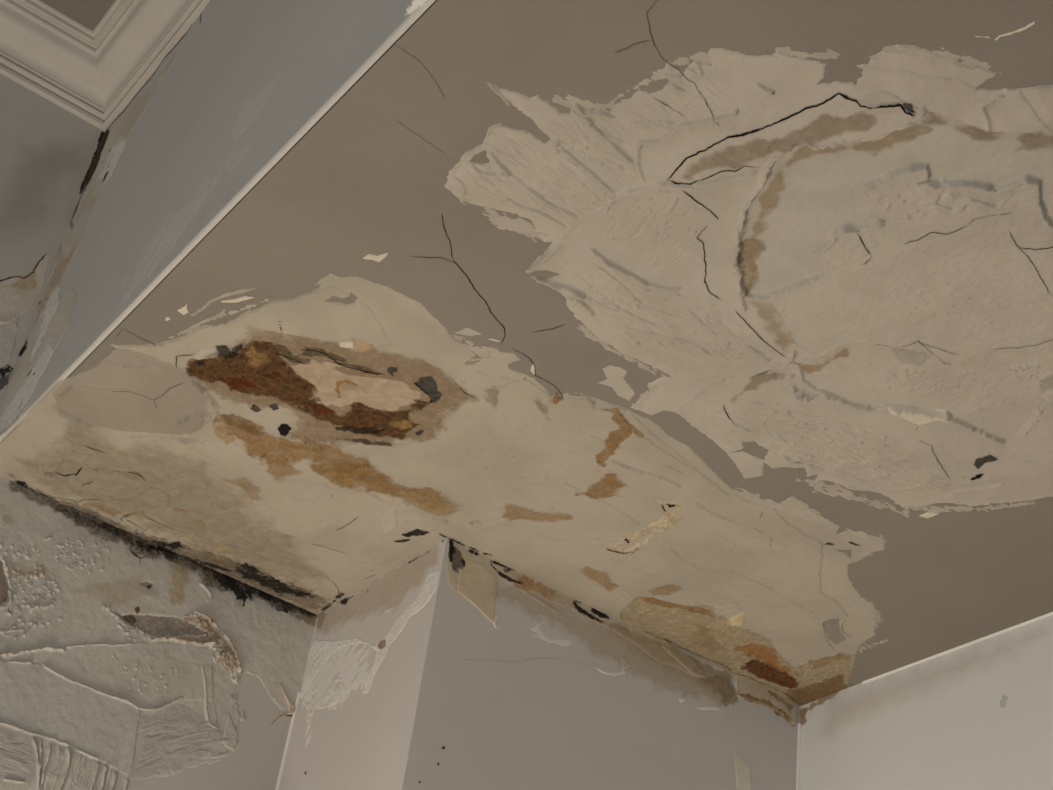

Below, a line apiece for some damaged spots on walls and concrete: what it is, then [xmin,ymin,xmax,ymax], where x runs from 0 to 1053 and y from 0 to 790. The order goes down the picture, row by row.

crack [0,255,45,282]
peeling [0,51,179,440]
damp [11,481,433,628]
peeling [277,424,291,436]
damp [186,332,473,515]
peeling [414,376,442,403]
peeling [268,540,690,748]
crack [421,218,563,399]
damp [395,529,737,705]
crack [614,0,913,376]
damp [688,114,941,177]
peeling [970,455,997,480]